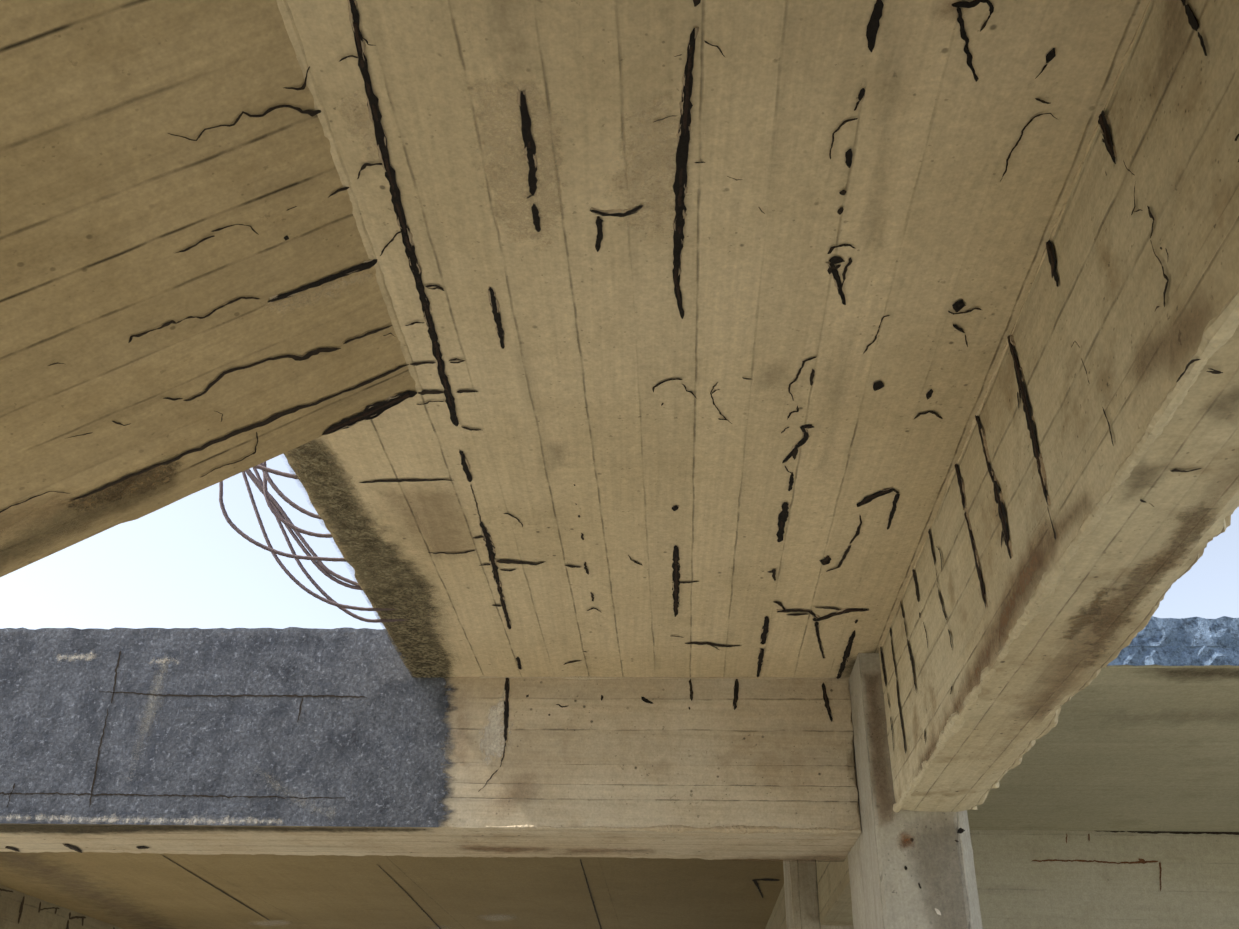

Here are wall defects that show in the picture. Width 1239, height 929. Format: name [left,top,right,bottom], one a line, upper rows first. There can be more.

crack [168,66,321,141]
crack [328,187,349,198]
crack [176,224,259,253]
crack [128,297,260,343]
crack [880,529,952,753]
leakage [945,516,1072,726]
leakage [1167,668,1239,677]